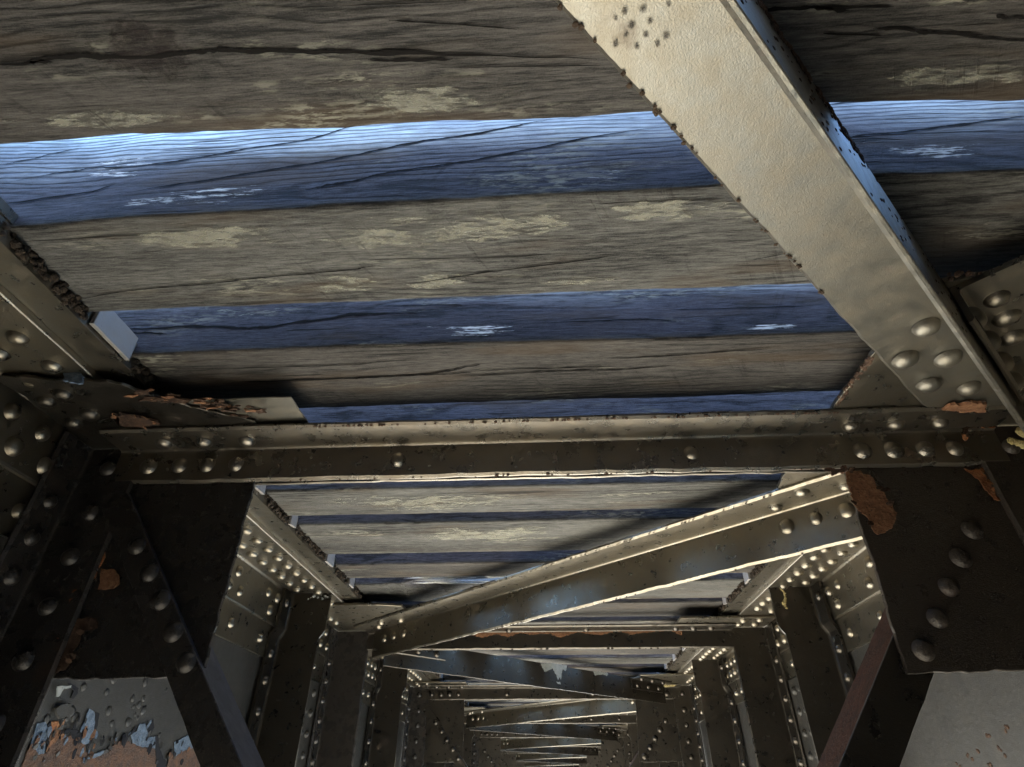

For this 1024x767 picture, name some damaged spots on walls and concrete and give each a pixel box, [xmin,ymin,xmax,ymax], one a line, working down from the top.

corrosion [111,412,161,430]
corrosion [123,388,267,419]
corrosion [941,400,987,414]
corrosion [794,465,897,535]
corrosion [94,553,120,590]
peeling [21,678,200,767]